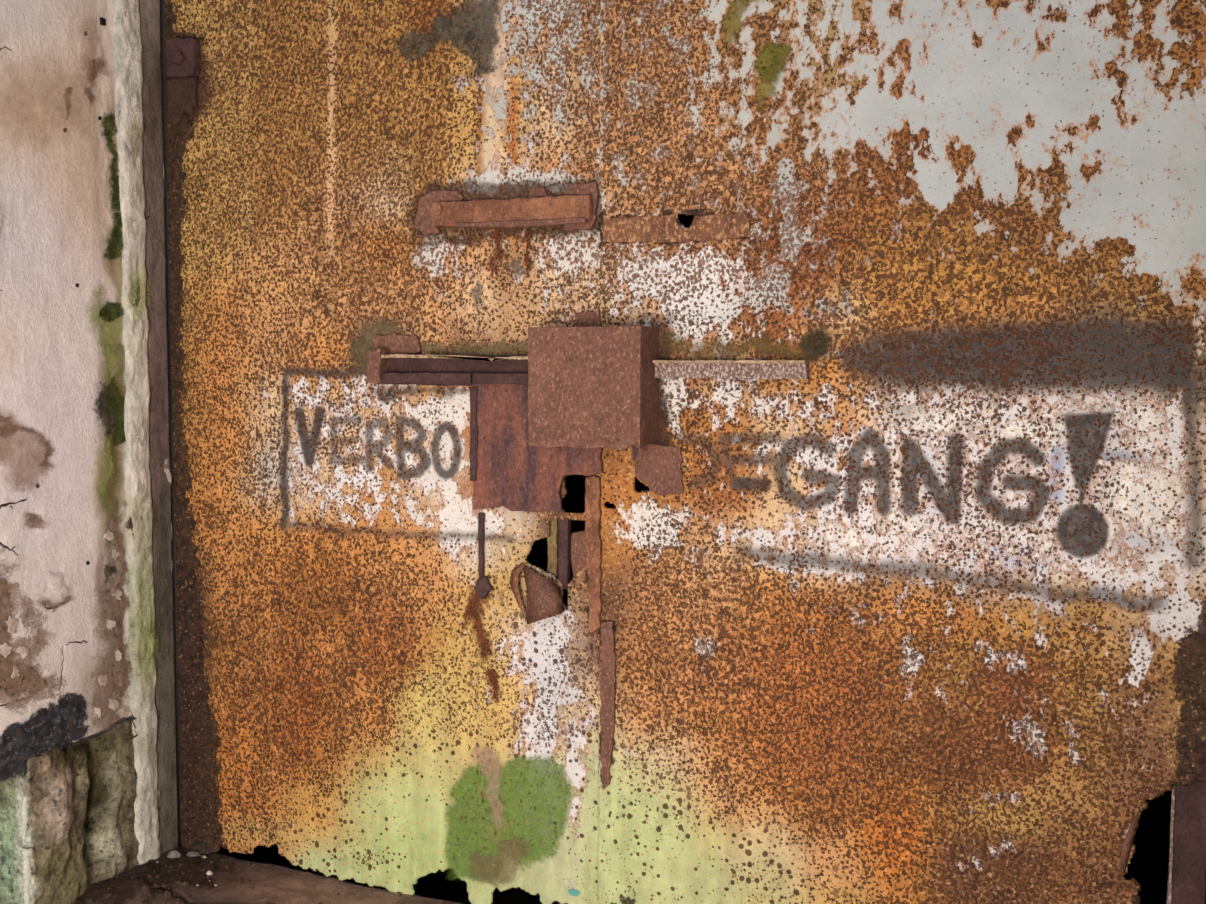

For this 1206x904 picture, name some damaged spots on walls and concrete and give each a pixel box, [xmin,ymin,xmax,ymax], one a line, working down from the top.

rust [487,228,502,271]
rust [524,227,532,275]
leakage [94,377,126,445]
leakage [0,414,53,486]
crack [0,498,28,509]
flaking render [0,518,132,782]
rust [462,591,499,702]